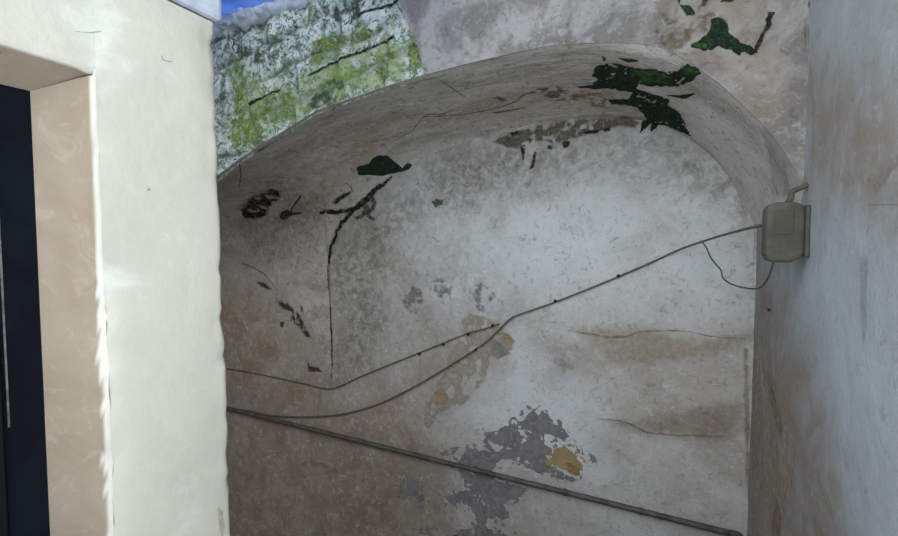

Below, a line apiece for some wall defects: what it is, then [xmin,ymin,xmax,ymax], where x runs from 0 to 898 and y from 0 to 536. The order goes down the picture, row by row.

peeling [531,86,583,101]
peeling [656,13,713,48]
crack [319,176,392,380]
peeling [424,283,515,428]
peeling [439,405,597,536]